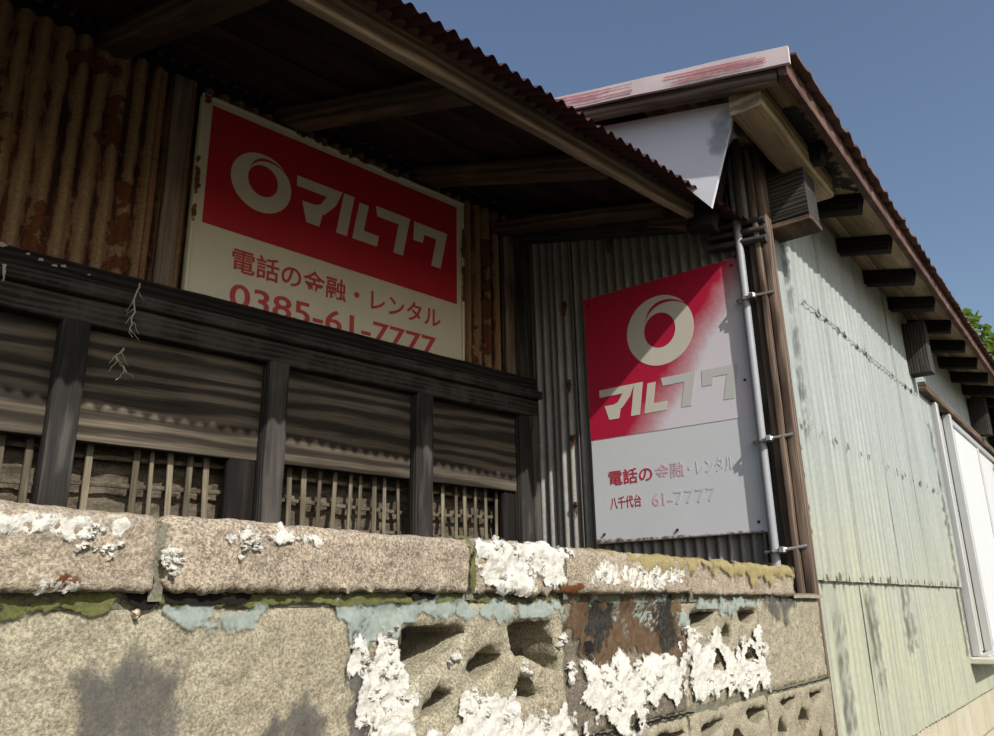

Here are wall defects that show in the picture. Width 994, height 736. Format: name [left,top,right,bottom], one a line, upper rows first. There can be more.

rust [101,177,137,275]
damp [32,578,83,595]
damp [0,511,131,561]
damp [474,535,574,598]
damp [589,560,685,592]
damp [346,624,772,736]